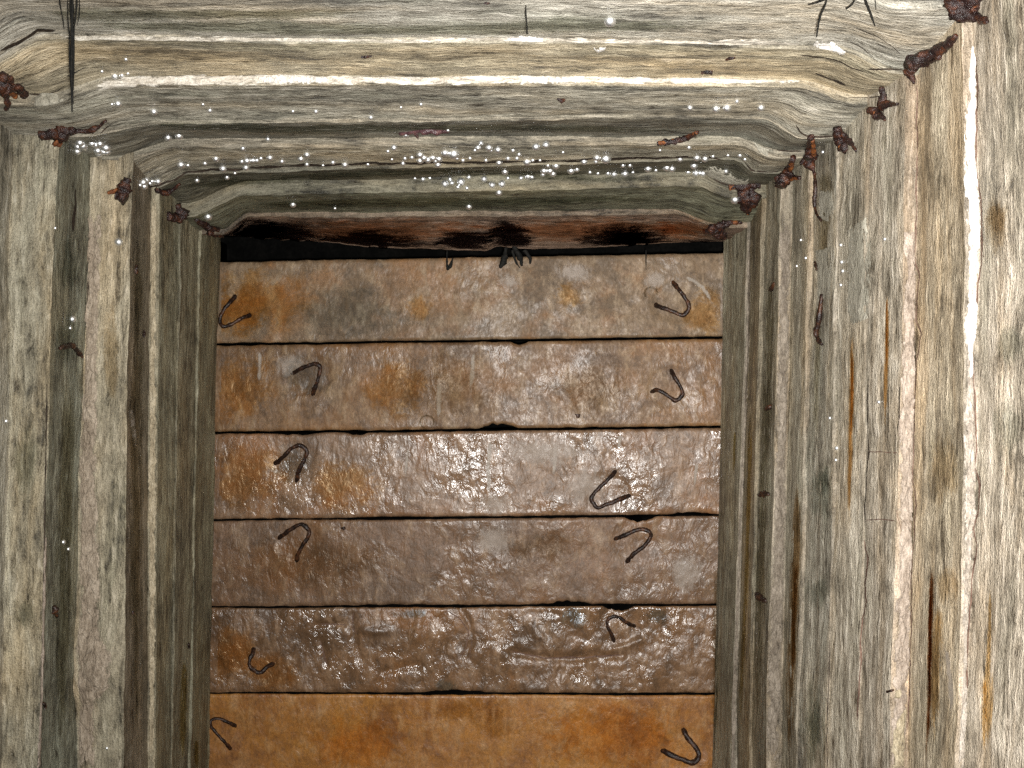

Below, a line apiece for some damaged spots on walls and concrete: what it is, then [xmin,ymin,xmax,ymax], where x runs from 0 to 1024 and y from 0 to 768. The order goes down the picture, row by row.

damp [223,219,534,250]
damp [574,224,719,247]